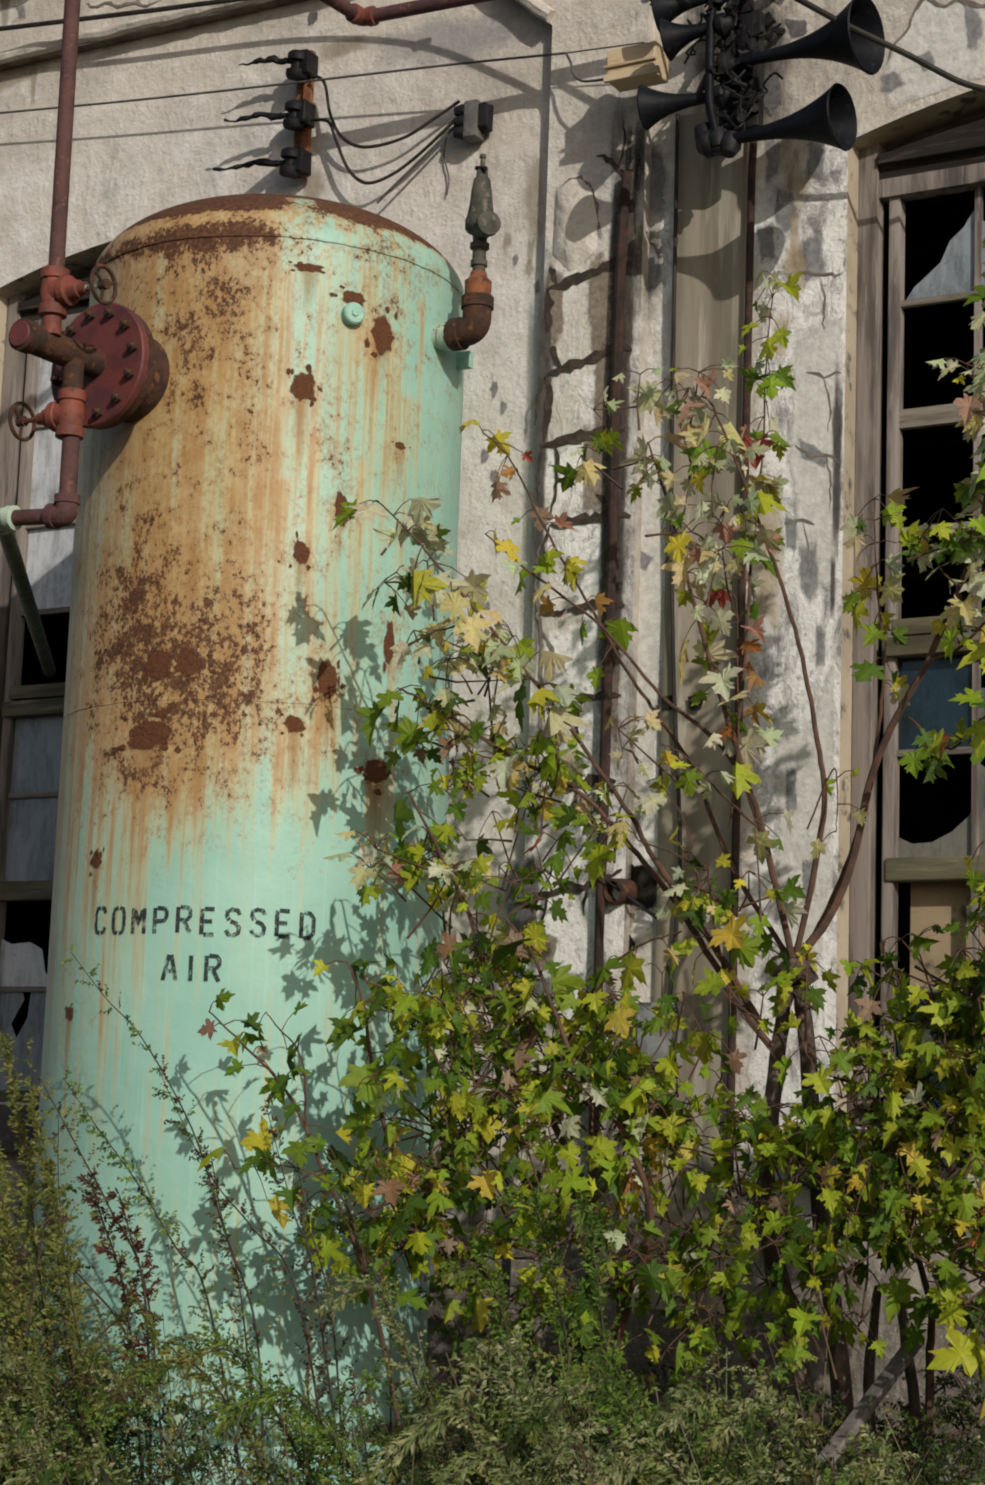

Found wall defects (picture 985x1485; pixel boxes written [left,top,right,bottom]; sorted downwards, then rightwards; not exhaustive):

peeling [881,0,985,108]